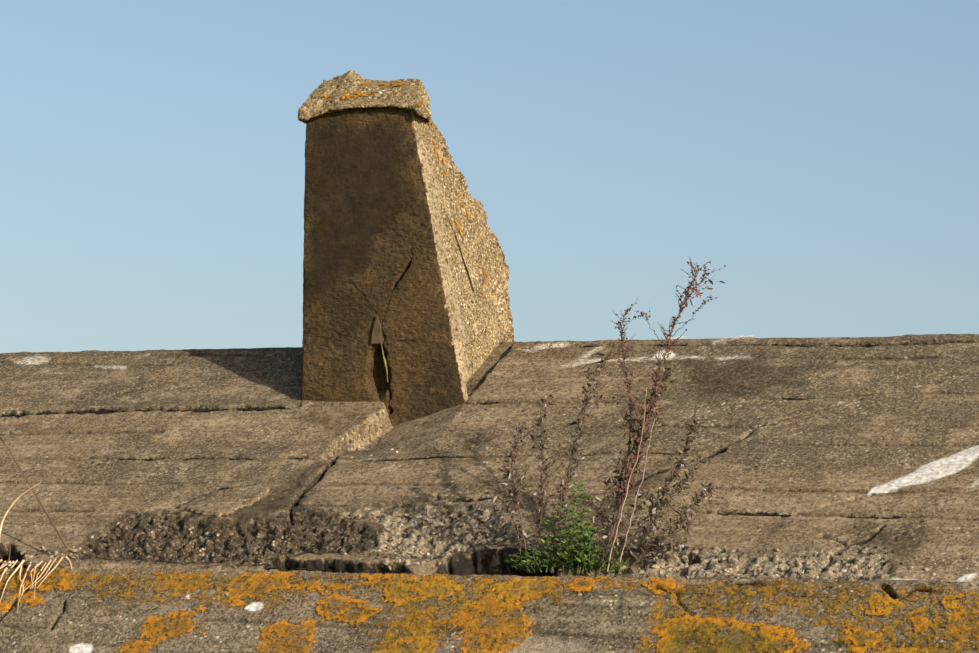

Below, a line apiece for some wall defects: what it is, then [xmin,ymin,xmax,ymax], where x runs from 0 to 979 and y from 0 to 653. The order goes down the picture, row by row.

crack [350,249,417,419]
crack [1,392,290,418]
water stain [869,445,979,495]
spalling [59,482,522,572]
crack [718,510,791,518]
crack [833,516,907,555]